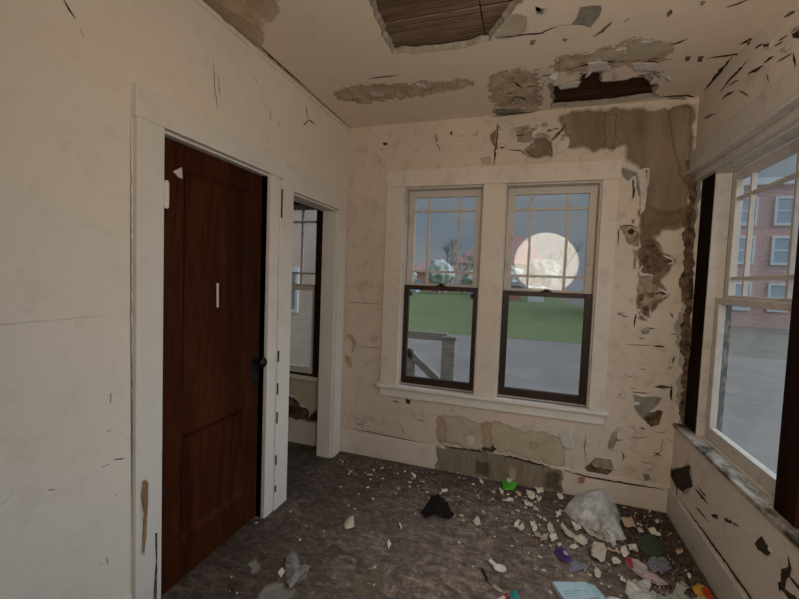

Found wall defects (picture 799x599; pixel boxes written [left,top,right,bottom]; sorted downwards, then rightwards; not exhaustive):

flaking render [369,0,548,54]
peeling [334,75,474,104]
peeling [488,37,687,116]
peeling [718,26,799,99]
peeling [497,123,572,159]
flaking render [584,149,702,475]
peeling [435,416,575,494]
flaking render [670,463,707,503]
peeling [755,536,774,556]
peeling [778,557,799,599]